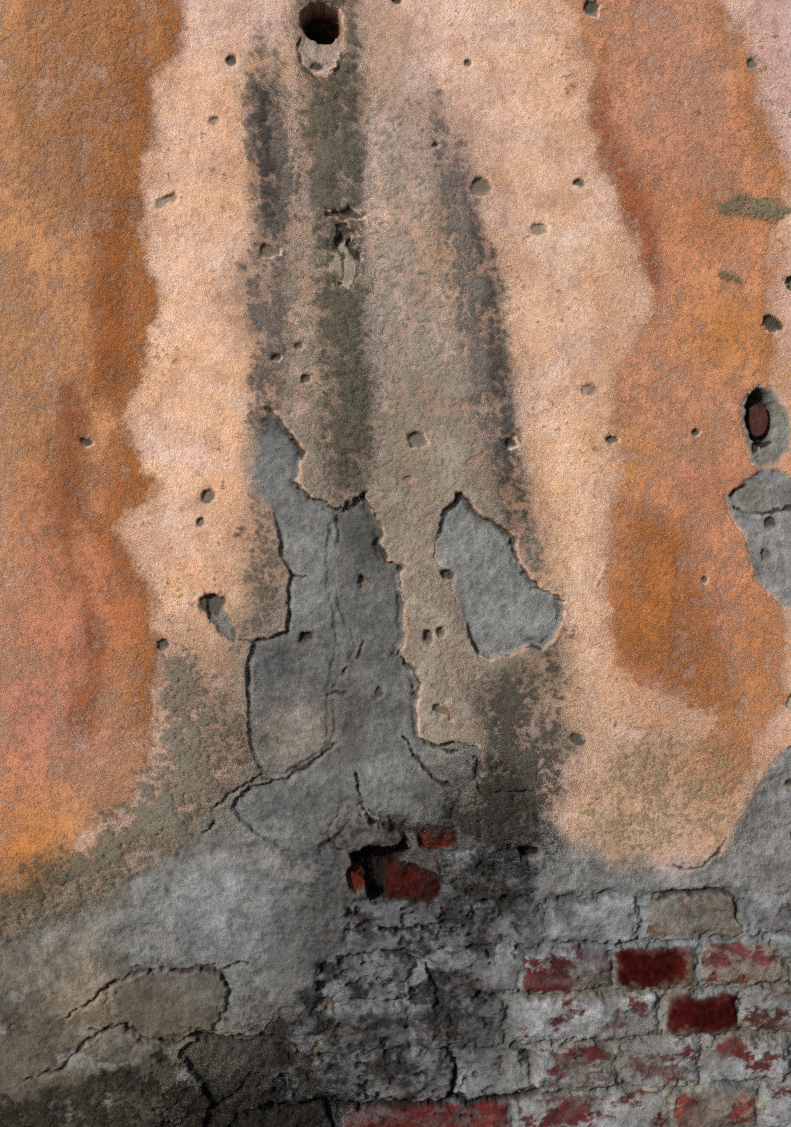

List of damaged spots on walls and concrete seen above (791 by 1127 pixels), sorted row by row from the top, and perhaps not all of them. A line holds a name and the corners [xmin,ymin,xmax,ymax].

spalling [76,433,94,449]
hole [151,633,174,657]
damp [0,0,575,1127]
spalling [577,381,606,398]
peeling [723,373,791,611]
flaking render [176,413,791,1127]
crack [21,960,544,1127]